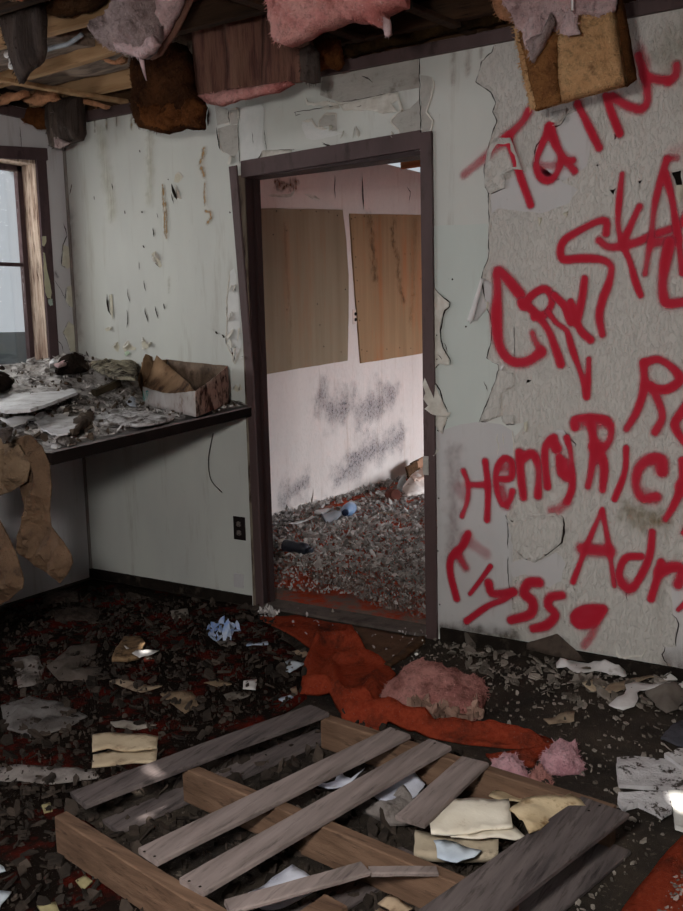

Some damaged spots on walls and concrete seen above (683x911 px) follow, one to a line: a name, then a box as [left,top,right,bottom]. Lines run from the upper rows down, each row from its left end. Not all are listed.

peeling [294,59,435,140]
peeling [207,104,265,161]
spalling [171,172,183,200]
spalling [671,169,683,204]
peeling [467,44,522,425]
spalling [105,294,113,331]
peeling [225,269,244,364]
peeling [434,287,451,368]
peeling [423,378,451,433]